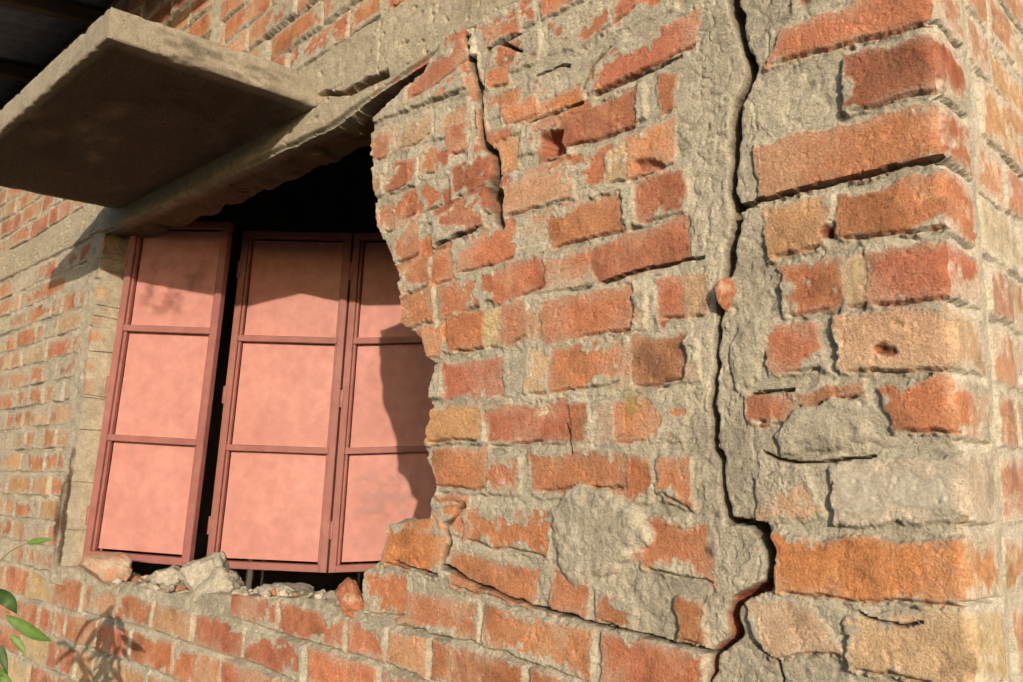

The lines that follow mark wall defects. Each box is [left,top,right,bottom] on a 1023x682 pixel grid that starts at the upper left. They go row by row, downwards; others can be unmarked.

spalling [335,577,364,618]
crack [393,0,946,682]